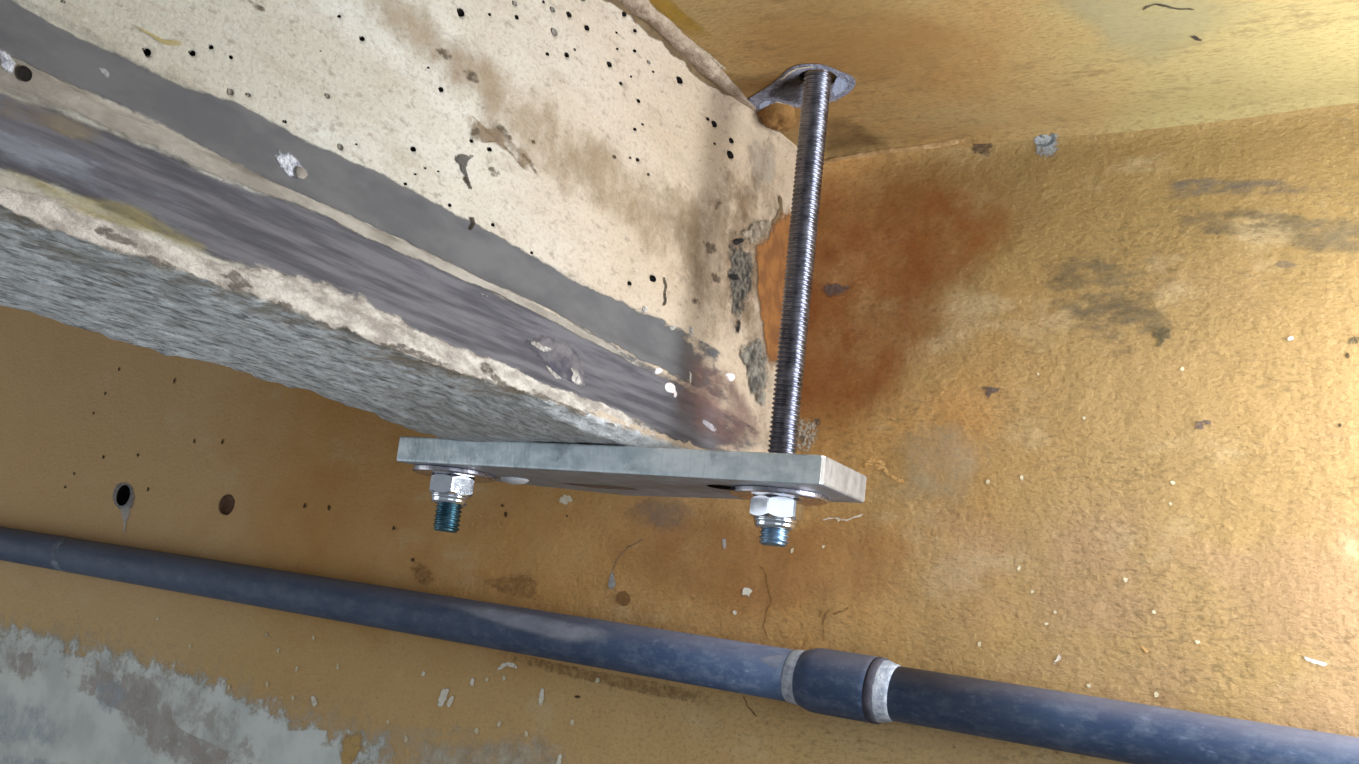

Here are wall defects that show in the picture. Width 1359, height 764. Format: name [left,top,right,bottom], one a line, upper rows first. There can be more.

water stain [728,238,753,332]
peeling [0,624,391,764]
peeling [438,688,454,708]